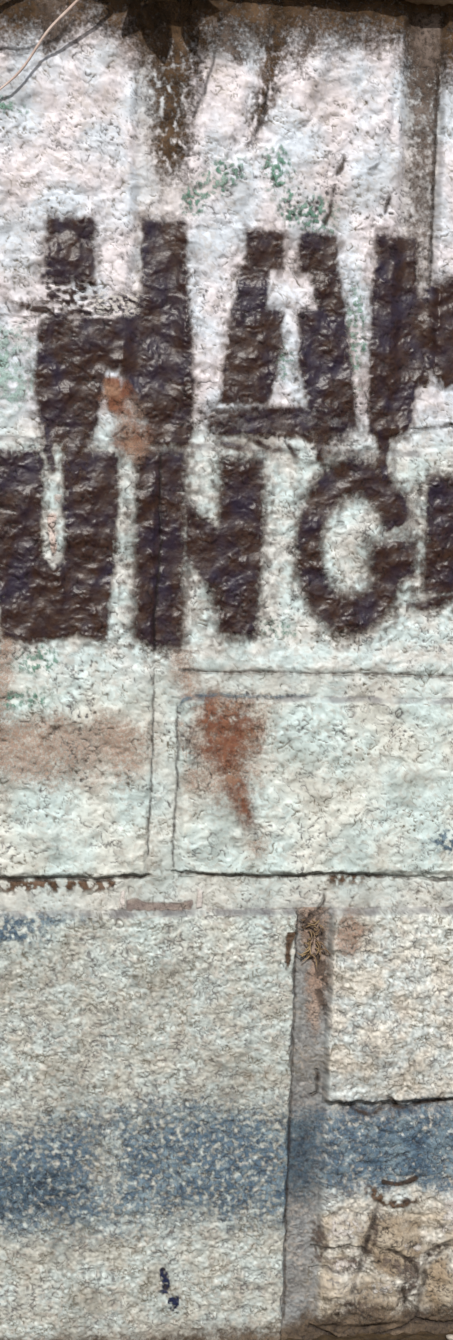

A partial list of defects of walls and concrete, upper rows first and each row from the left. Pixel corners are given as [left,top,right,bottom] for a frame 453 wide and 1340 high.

leakage [0,0,453,285]
rust [103,377,147,458]
rust [174,649,268,823]